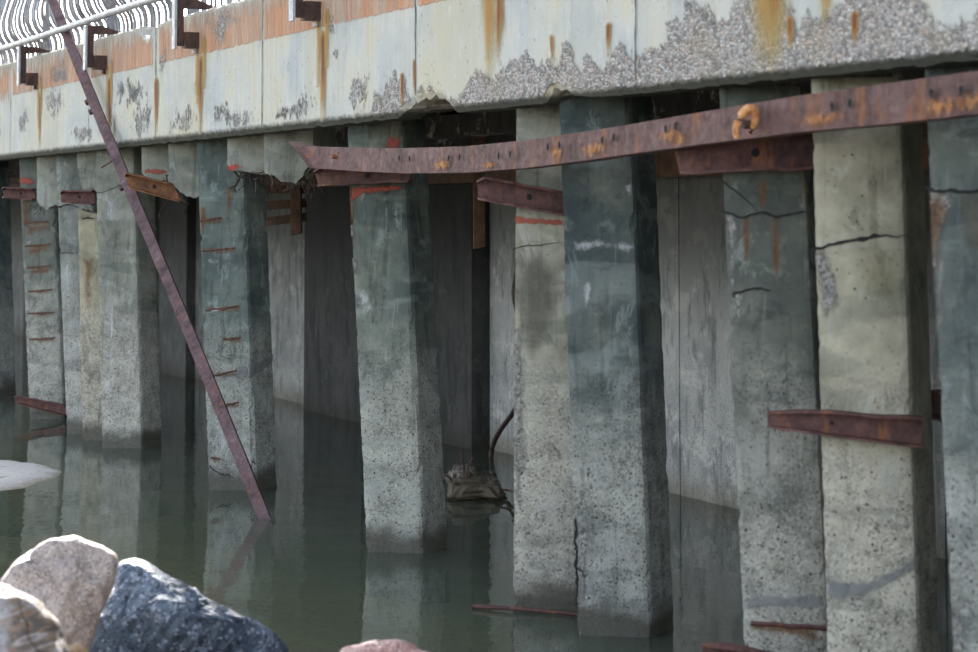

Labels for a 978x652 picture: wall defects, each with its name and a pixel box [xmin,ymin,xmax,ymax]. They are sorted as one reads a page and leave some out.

corrosion [483,0,503,62]
corrosion [196,38,205,128]
corrosion [317,10,328,110]
corrosion [401,60,415,103]
spalling [349,0,978,115]
corrosion [927,94,978,114]
spalling [230,167,327,204]
crack [721,179,811,219]
crack [923,186,978,194]
crack [811,233,907,267]
crack [573,519,585,614]